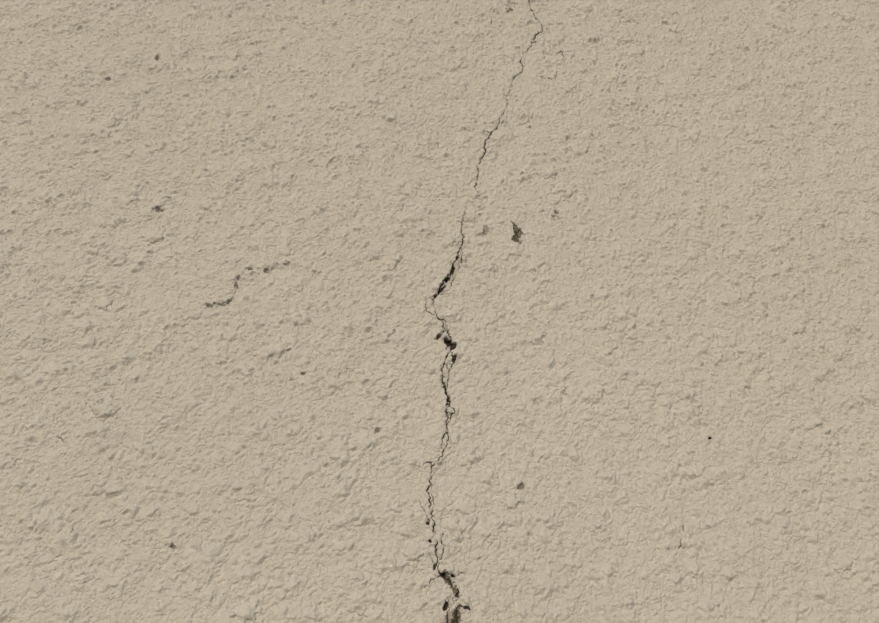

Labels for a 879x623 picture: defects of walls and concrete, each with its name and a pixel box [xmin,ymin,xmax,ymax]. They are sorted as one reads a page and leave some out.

crack [419,0,567,623]